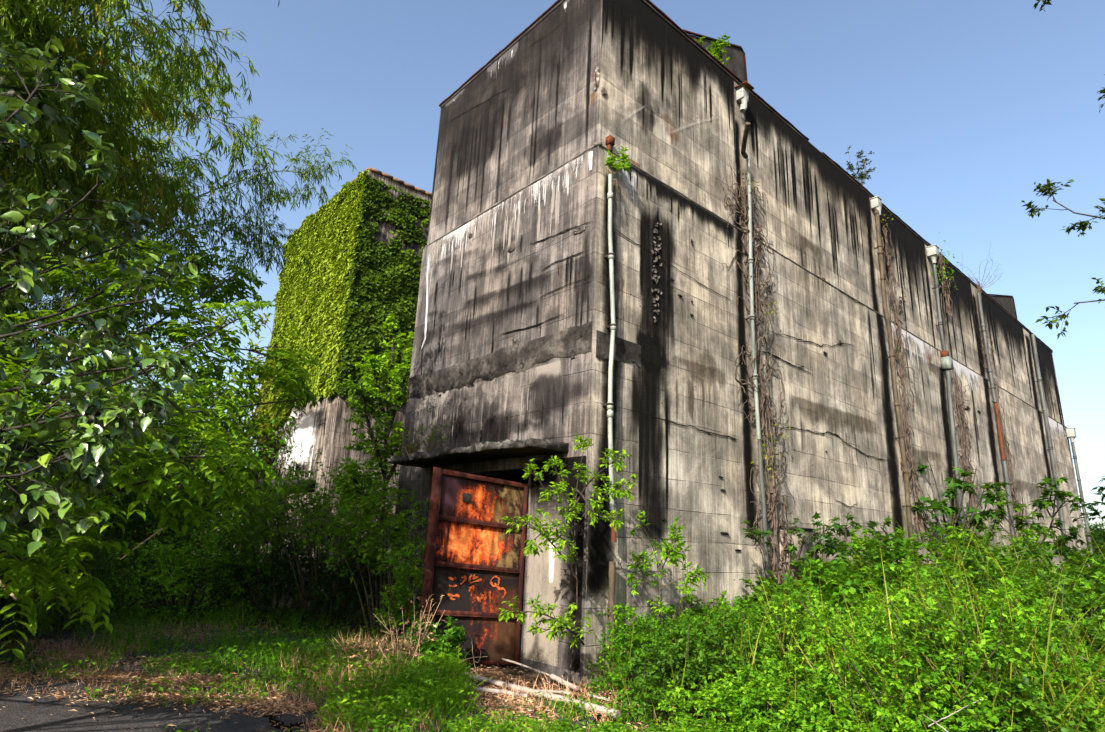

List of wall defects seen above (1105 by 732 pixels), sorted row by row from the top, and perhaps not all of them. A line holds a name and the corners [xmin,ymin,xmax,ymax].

water stain [413,0,1071,596]
crack [651,416,738,440]
crack [773,425,885,464]